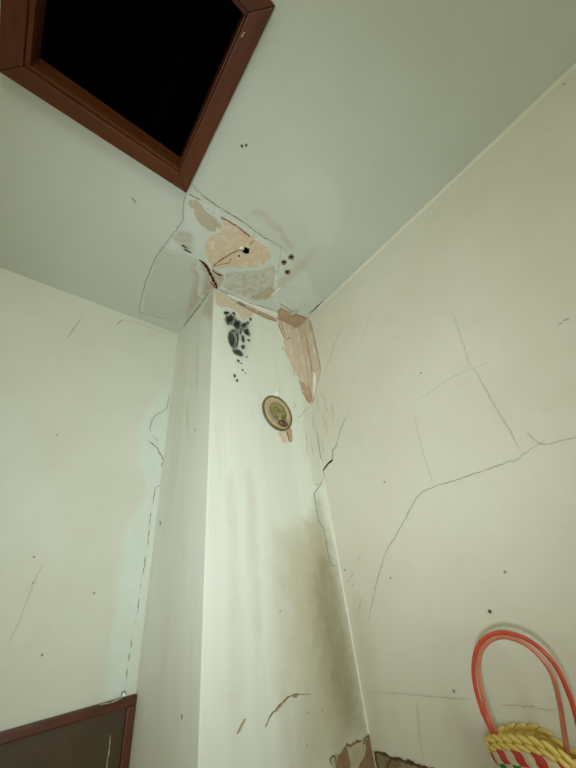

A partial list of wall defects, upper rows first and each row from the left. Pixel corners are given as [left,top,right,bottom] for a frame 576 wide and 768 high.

crack [116,184,323,335]
water stain [199,290,256,383]
peeling [186,194,321,405]
rust [280,253,296,276]
peeling [277,427,292,444]
crack [293,391,347,566]
crack [368,316,575,620]
water stain [220,395,397,768]
crack [265,693,311,727]
spalling [330,733,433,768]